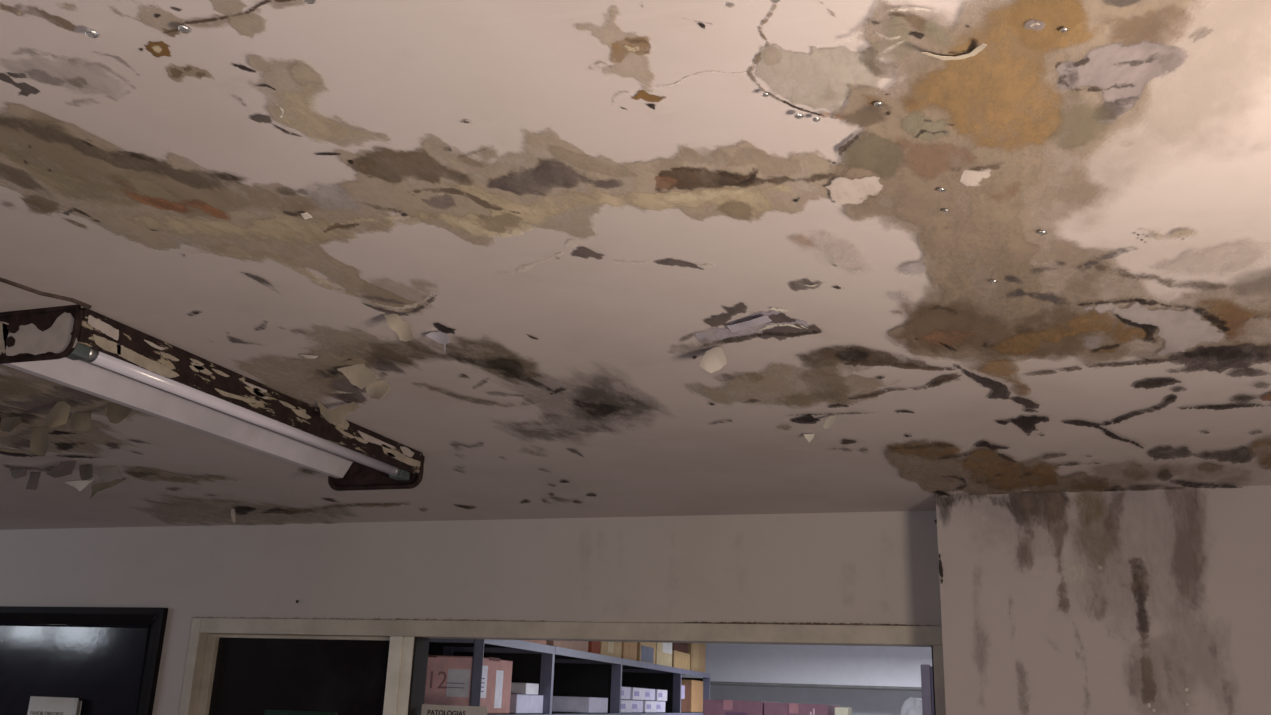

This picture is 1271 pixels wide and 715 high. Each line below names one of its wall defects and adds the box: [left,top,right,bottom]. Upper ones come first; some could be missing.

crack [164,0,294,37]
peeling [233,55,390,147]
crack [748,3,836,119]
peeling [891,7,987,60]
peeling [656,259,711,270]
peeling [0,364,226,499]
peeling [239,327,403,424]
water stain [318,340,654,439]
peeling [681,303,822,373]
water stain [691,365,884,443]
water stain [885,435,1174,611]
water stain [1129,558,1156,713]